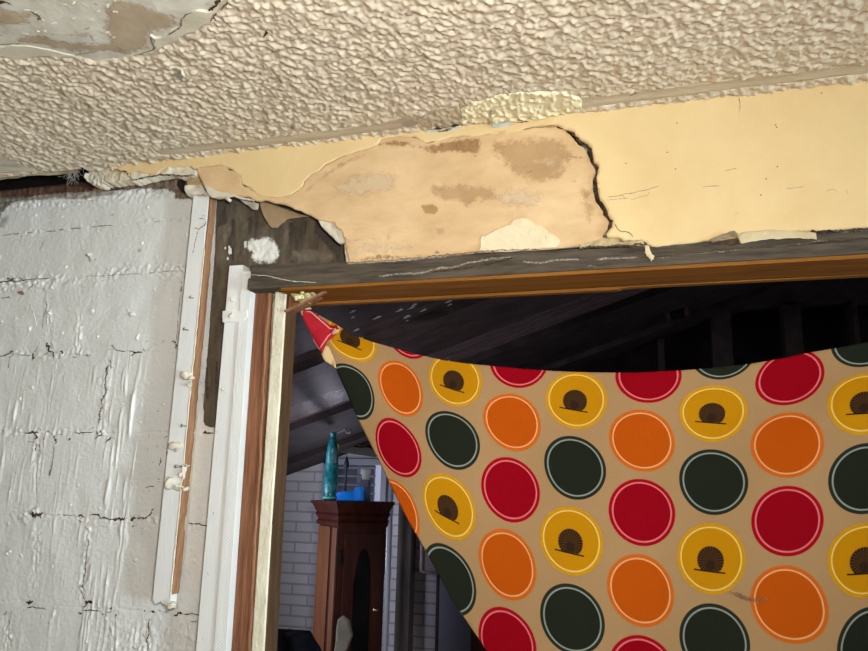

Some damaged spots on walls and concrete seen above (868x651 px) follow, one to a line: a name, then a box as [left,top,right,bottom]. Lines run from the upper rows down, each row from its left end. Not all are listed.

peeling [0,0,228,61]
crack [524,125,658,250]
crack [1,198,113,246]
crack [0,276,49,284]
flaking render [96,120,609,434]
crack [0,304,88,368]
crack [25,194,206,651]